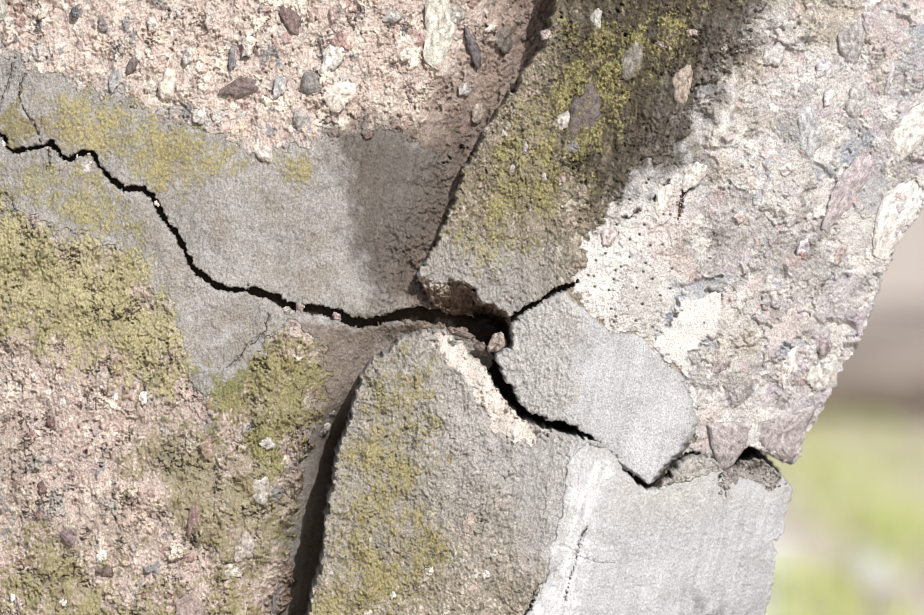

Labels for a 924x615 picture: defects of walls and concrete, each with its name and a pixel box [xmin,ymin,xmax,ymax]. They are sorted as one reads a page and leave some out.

crack [0,58,590,436]
crack [625,180,686,220]
spalling [526,0,924,615]
crack [524,470,620,615]
crack [622,453,727,497]